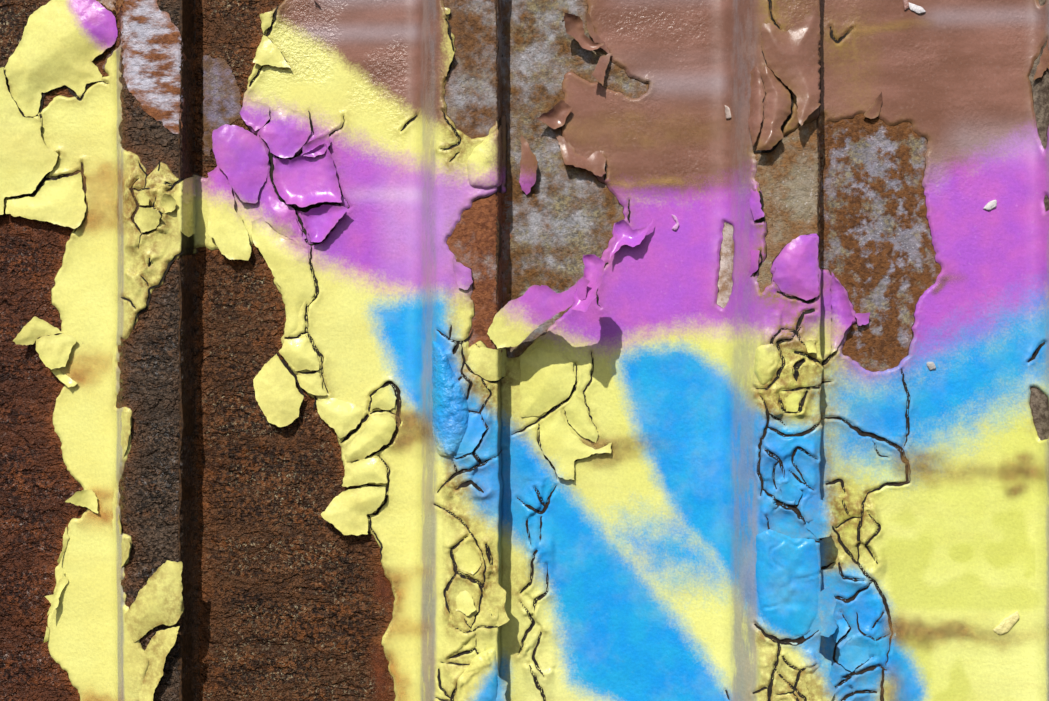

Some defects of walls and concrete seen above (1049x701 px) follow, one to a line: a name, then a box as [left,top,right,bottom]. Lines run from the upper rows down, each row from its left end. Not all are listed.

crack [4,49,108,133]
crack [5,154,88,232]
peeling [439,0,653,480]
peeling [717,222,734,308]
crack [754,191,765,223]
peeling [748,4,942,372]
peeling [0,0,396,701]
peeling [785,393,802,412]
corrosion [90,492,112,521]
crack [434,325,613,701]
crack [725,291,911,701]